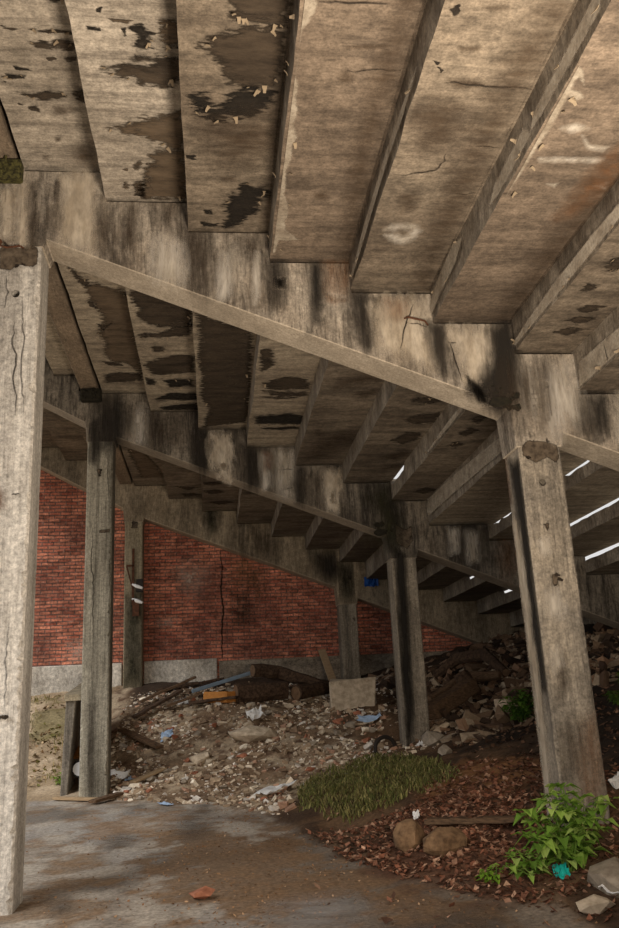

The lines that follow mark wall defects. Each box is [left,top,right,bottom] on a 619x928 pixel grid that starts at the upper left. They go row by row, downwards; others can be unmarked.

peeling [3,66,31,82]
peeling [18,89,85,112]
peeling [30,28,76,62]
peeling [100,0,316,252]
crack [6,278,25,401]
peeling [68,267,311,505]
water stain [467,319,538,417]
crack [218,551,226,660]